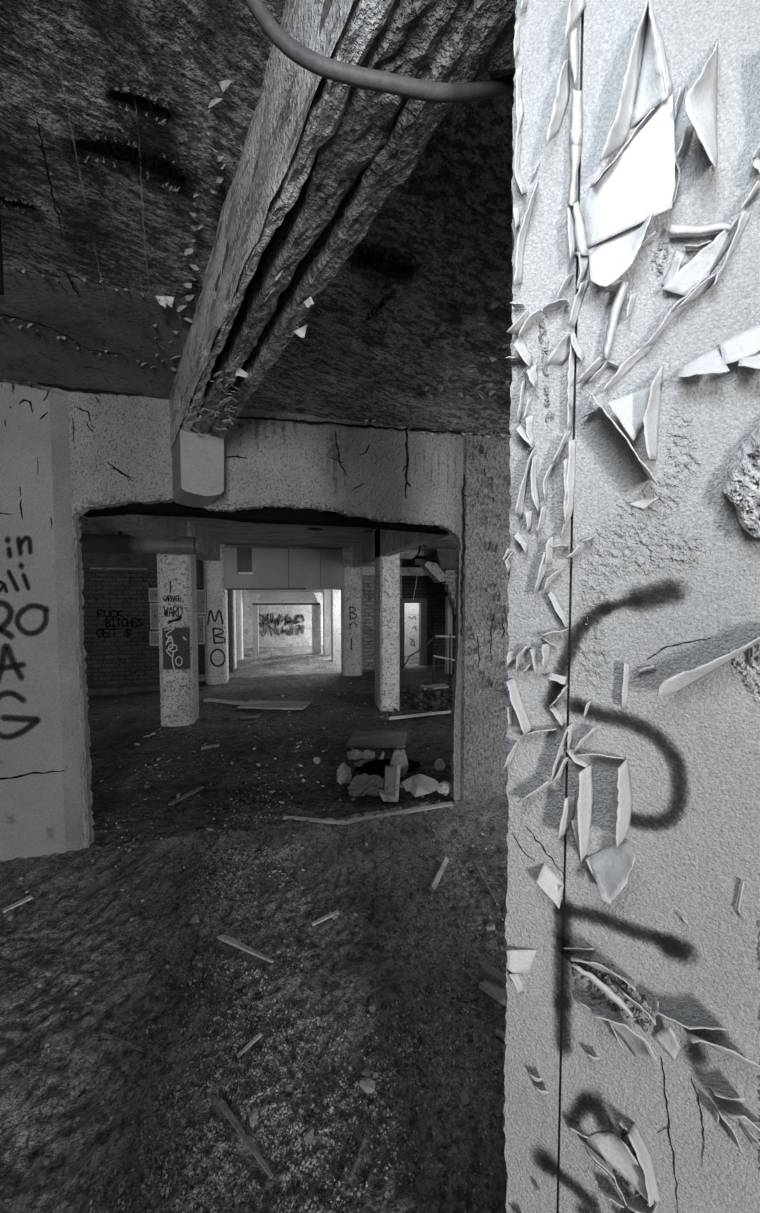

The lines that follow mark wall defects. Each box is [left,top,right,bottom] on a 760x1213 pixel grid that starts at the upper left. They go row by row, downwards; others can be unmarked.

spalling [0,80,232,372]
crack [236,416,501,499]
peeling [351,0,760,908]
crack [0,770,65,780]
peeling [567,1120,661,1213]
crack [658,1056,705,1212]